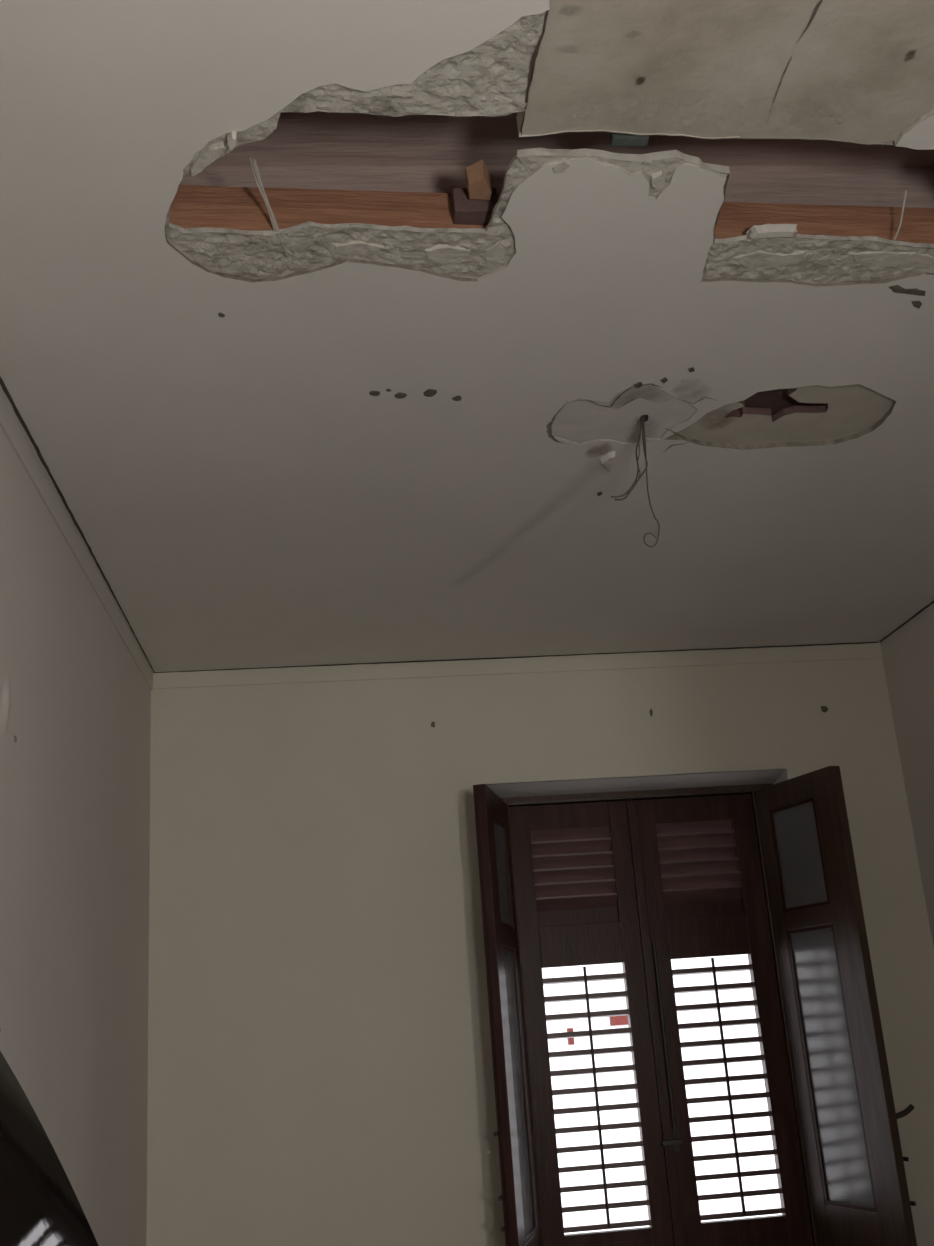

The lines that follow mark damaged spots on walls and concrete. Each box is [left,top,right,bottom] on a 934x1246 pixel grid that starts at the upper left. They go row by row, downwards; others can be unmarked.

crack [767,0,823,121]
flaking render [165,0,934,309]
flaking render [546,377,896,471]